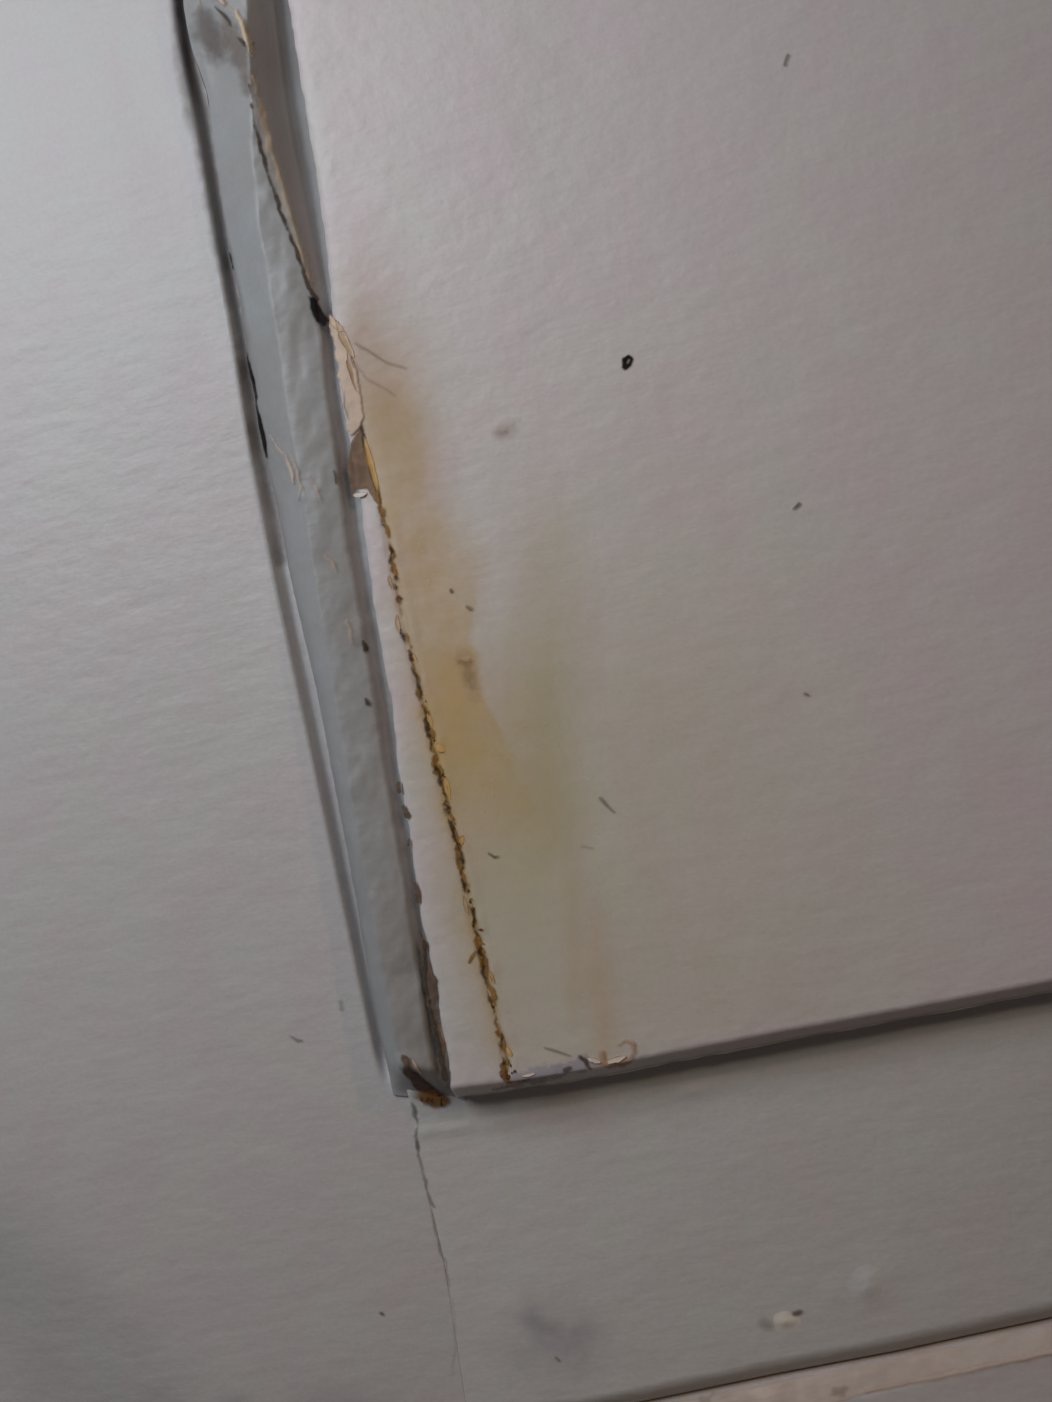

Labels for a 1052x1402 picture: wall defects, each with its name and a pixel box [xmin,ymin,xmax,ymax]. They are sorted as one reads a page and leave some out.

peeling [215,0,254,57]
peeling [329,315,381,505]
peeling [401,932,449,1091]